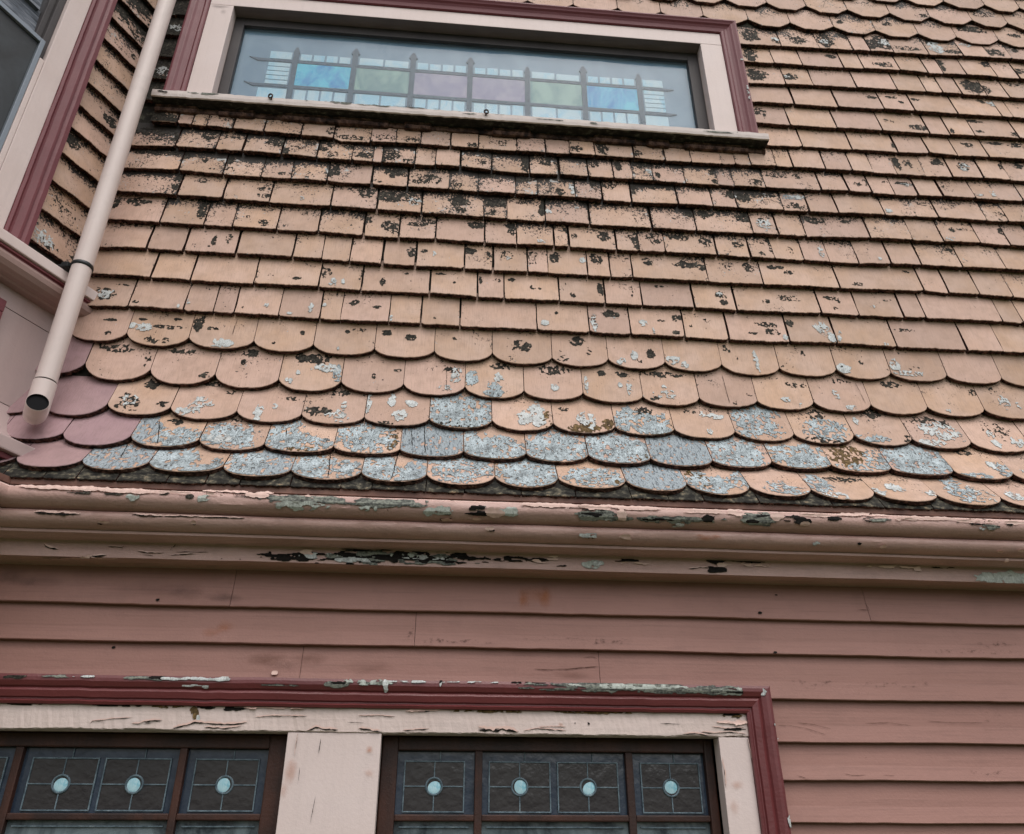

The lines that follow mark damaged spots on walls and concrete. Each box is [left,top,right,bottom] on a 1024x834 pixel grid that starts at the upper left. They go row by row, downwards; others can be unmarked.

peeling [866,11,992,71]
peeling [741,20,847,119]
peeling [264,127,579,229]
peeling [365,217,436,234]
peeling [579,214,712,266]
peeling [695,168,825,275]
peeling [83,346,1024,502]
peeling [19,484,1024,539]
peeling [257,549,567,567]
peeling [97,705,303,720]
peeling [324,679,426,693]
peeling [511,681,743,696]